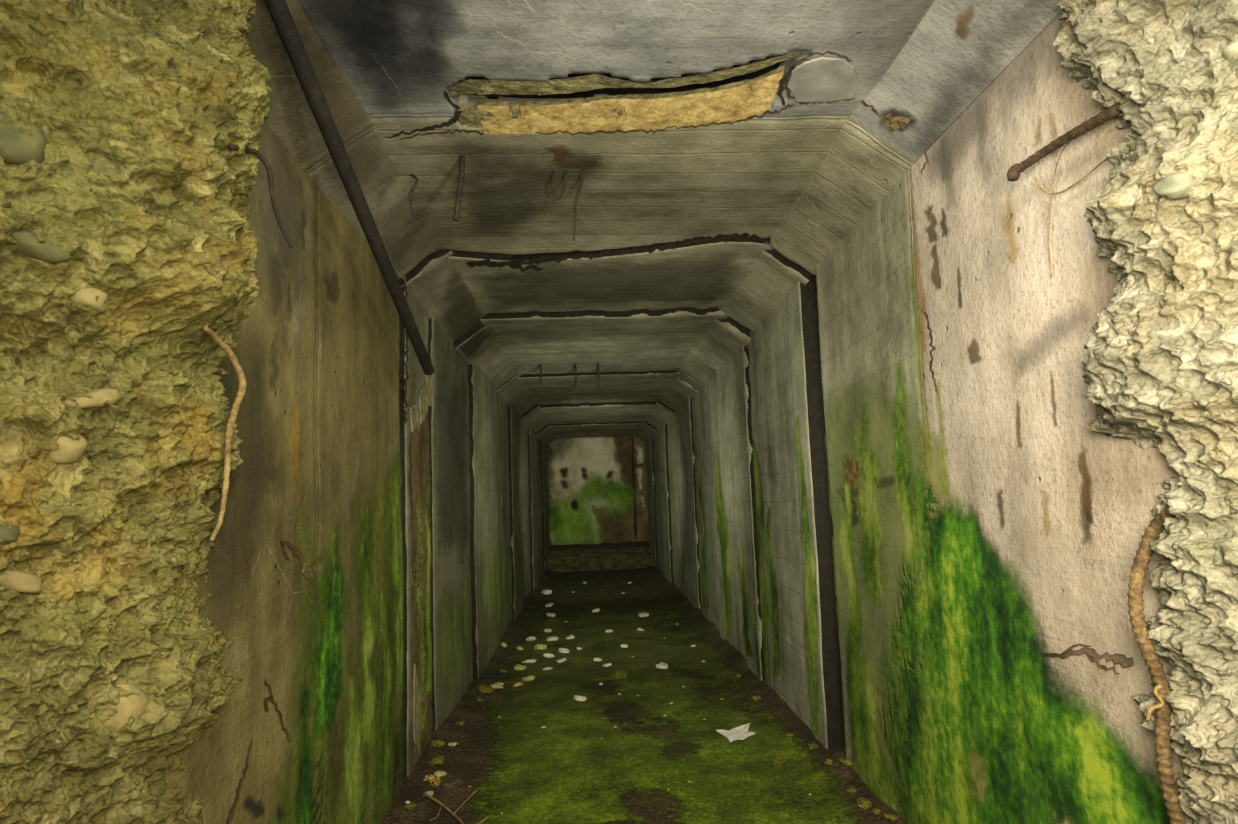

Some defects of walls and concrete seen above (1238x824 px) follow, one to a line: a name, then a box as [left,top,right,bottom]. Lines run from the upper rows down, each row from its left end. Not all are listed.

rust [552,148,597,169]
spalling [385,51,802,140]
spalling [880,110,915,132]
crack [467,233,771,272]
rust [925,206,948,288]
rust [968,339,981,363]
damp [893,364,917,559]
rust [1079,452,1093,538]
damp [296,473,403,824]
damp [840,415,929,824]
damp [929,507,1168,824]
crack [1041,644,1134,674]